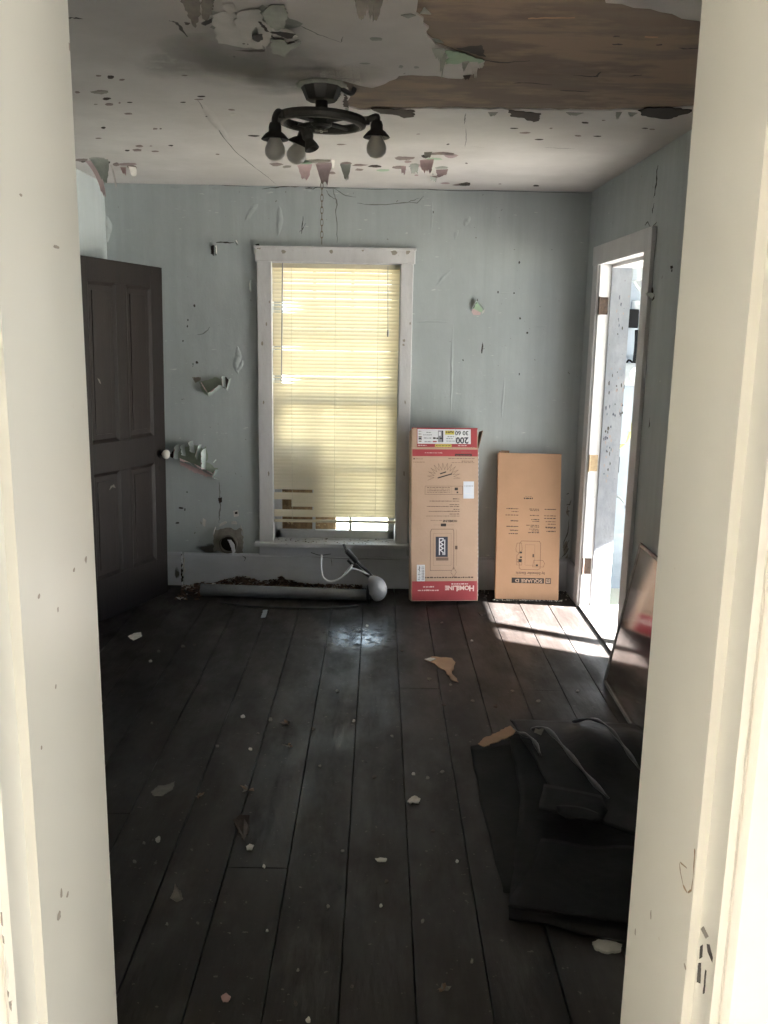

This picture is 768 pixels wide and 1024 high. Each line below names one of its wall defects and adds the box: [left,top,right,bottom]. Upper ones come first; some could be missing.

peeling [180,0,303,57]
flaking render [338,0,700,140]
peeling [75,145,173,197]
peeling [269,144,470,186]
peeling [192,361,231,397]
peeling [170,441,219,479]